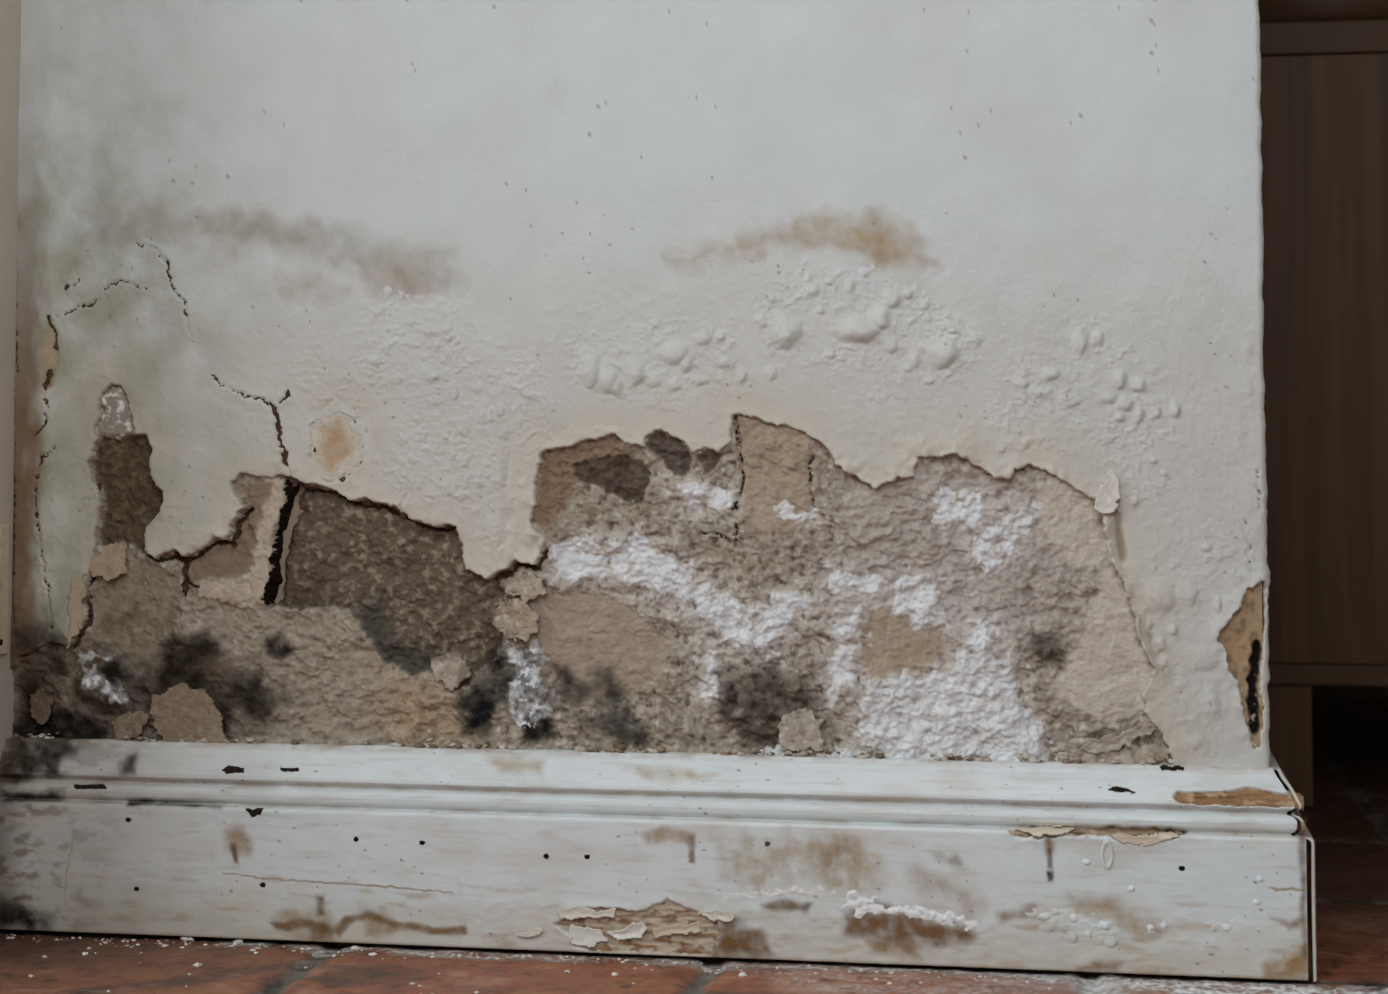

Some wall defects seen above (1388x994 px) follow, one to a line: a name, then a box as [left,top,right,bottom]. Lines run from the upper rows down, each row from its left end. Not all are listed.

crack [12,243,194,649]
spalling [13,385,1184,771]
efflorescence [677,478,734,514]
efflorescence [761,499,819,525]
efflorescence [928,484,1058,578]
damp [3,636,147,801]
peeling [222,765,244,774]
damp [459,639,584,741]
damp [547,522,1059,762]
peeling [1174,787,1304,811]
peeling [1218,581,1264,749]
peeling [558,905,735,948]